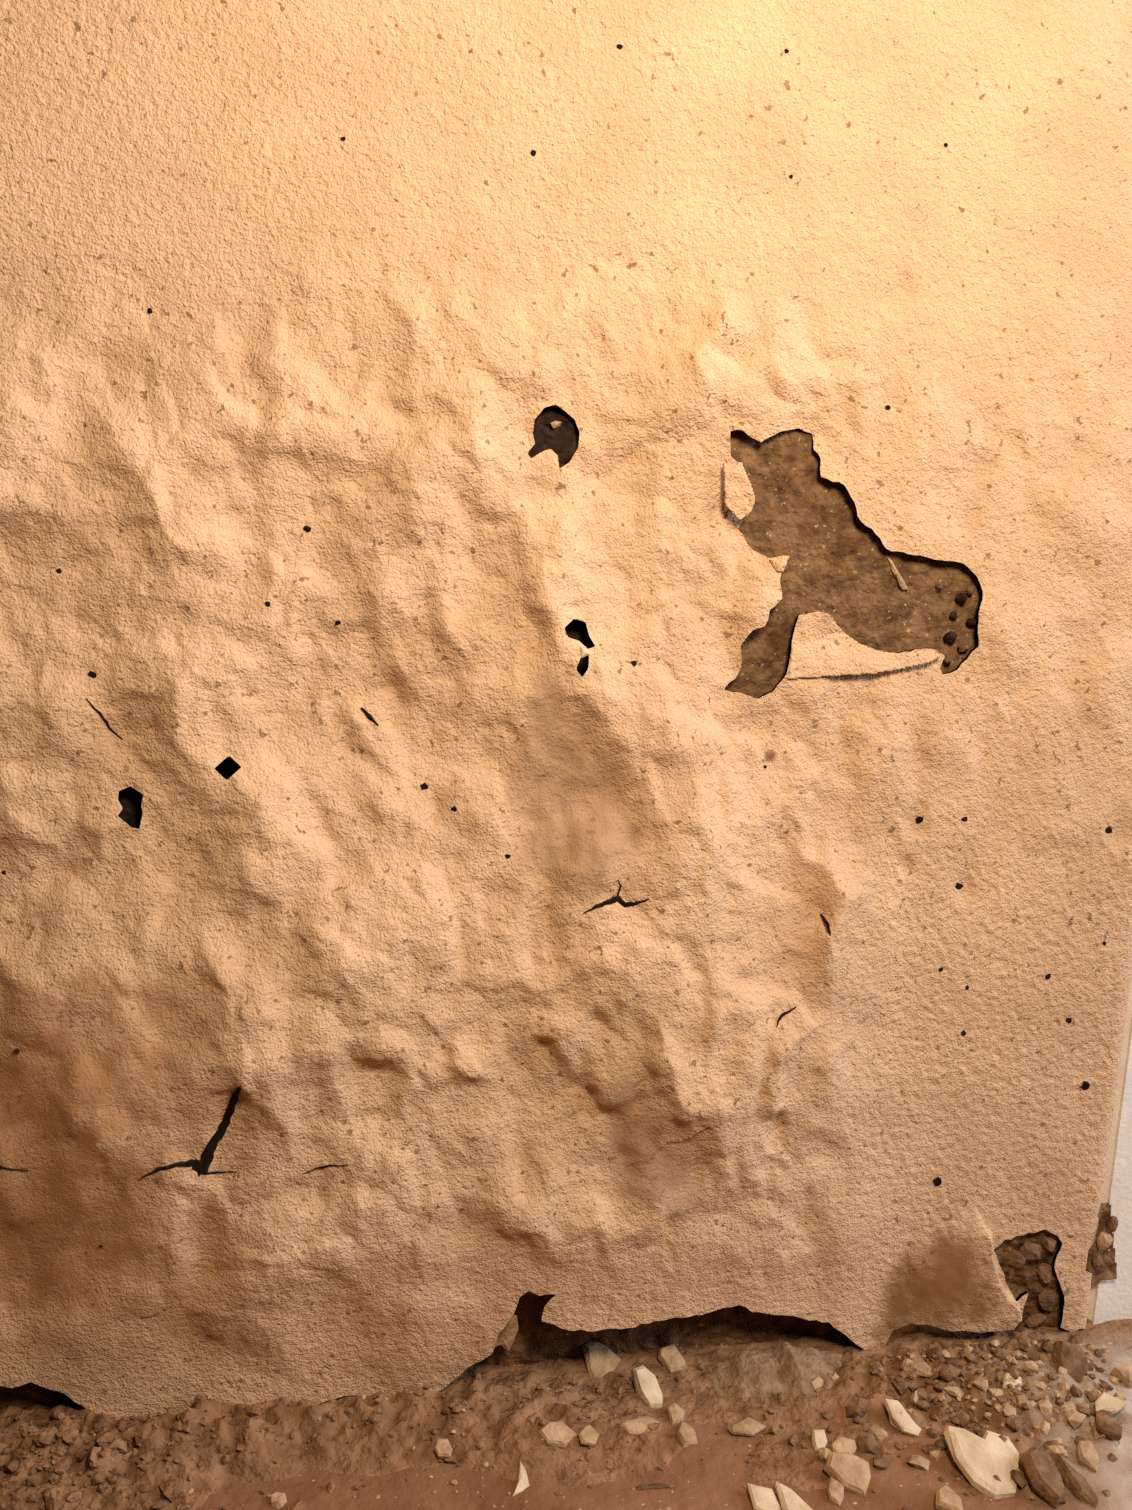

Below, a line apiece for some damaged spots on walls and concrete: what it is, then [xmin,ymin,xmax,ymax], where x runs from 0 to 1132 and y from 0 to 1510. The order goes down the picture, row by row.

spalling [723,428,981,698]
crack [138,1083,243,1181]
spalling [994,1230,1062,1328]
spalling [1086,1203,1118,1283]
peeling [473,1291,842,1448]